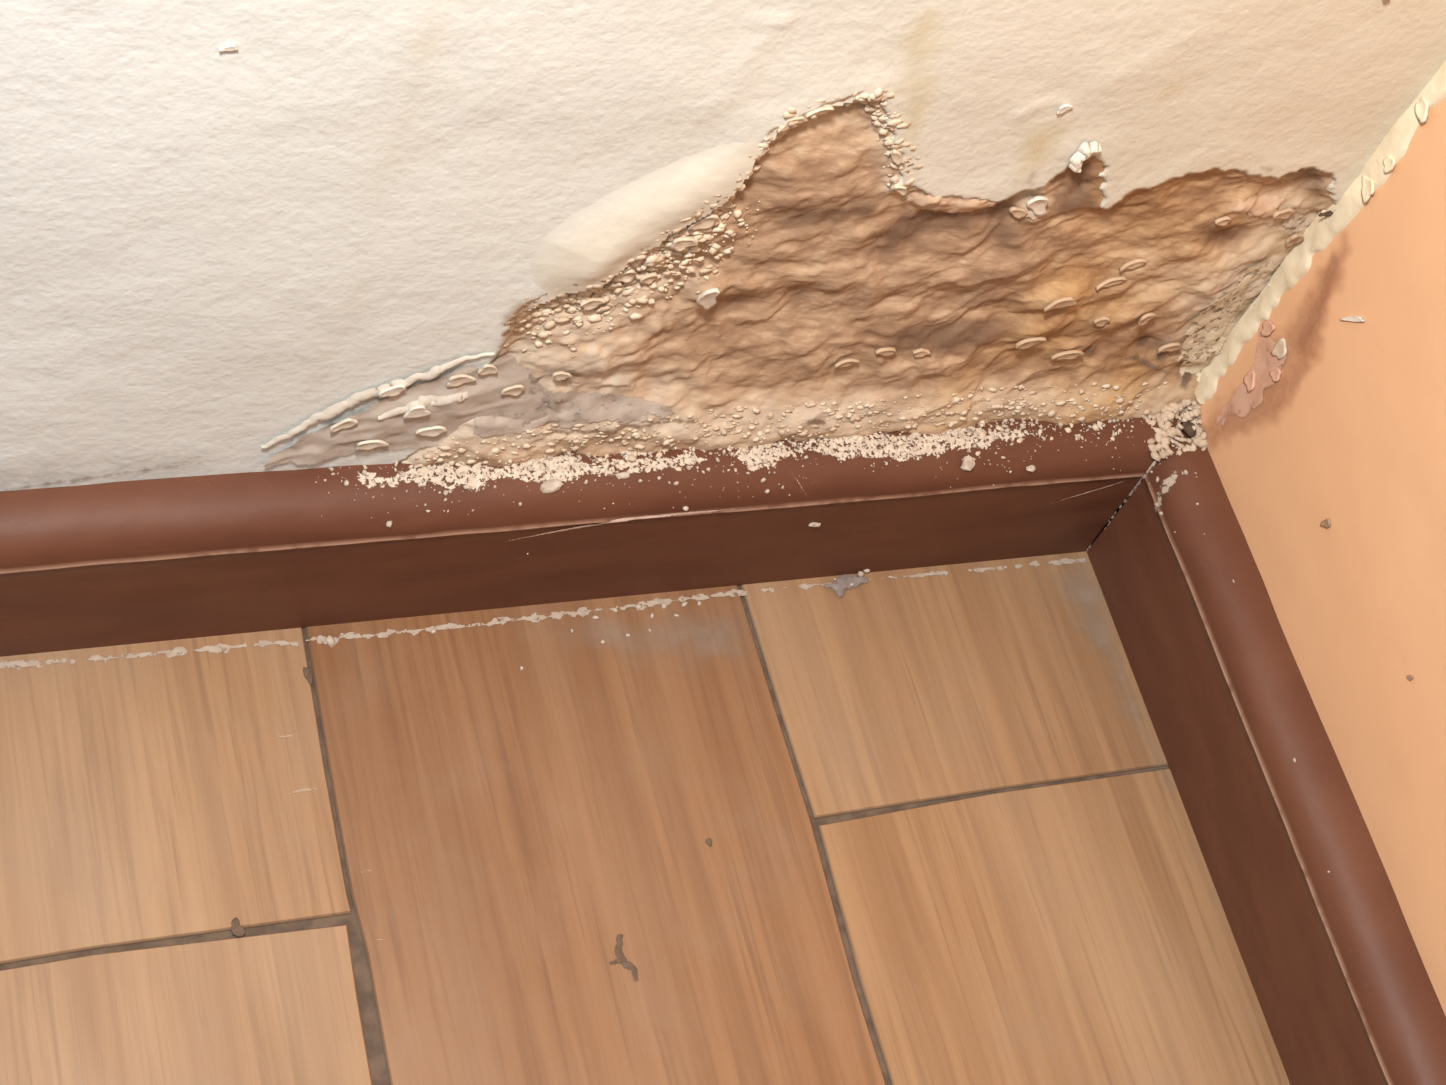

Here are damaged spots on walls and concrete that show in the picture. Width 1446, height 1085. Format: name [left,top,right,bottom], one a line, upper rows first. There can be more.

spalling [261,89,1334,471]
leakage [1212,259,1339,439]
leakage [356,450,707,490]
spalling [540,479,563,494]
leakage [733,422,1038,471]